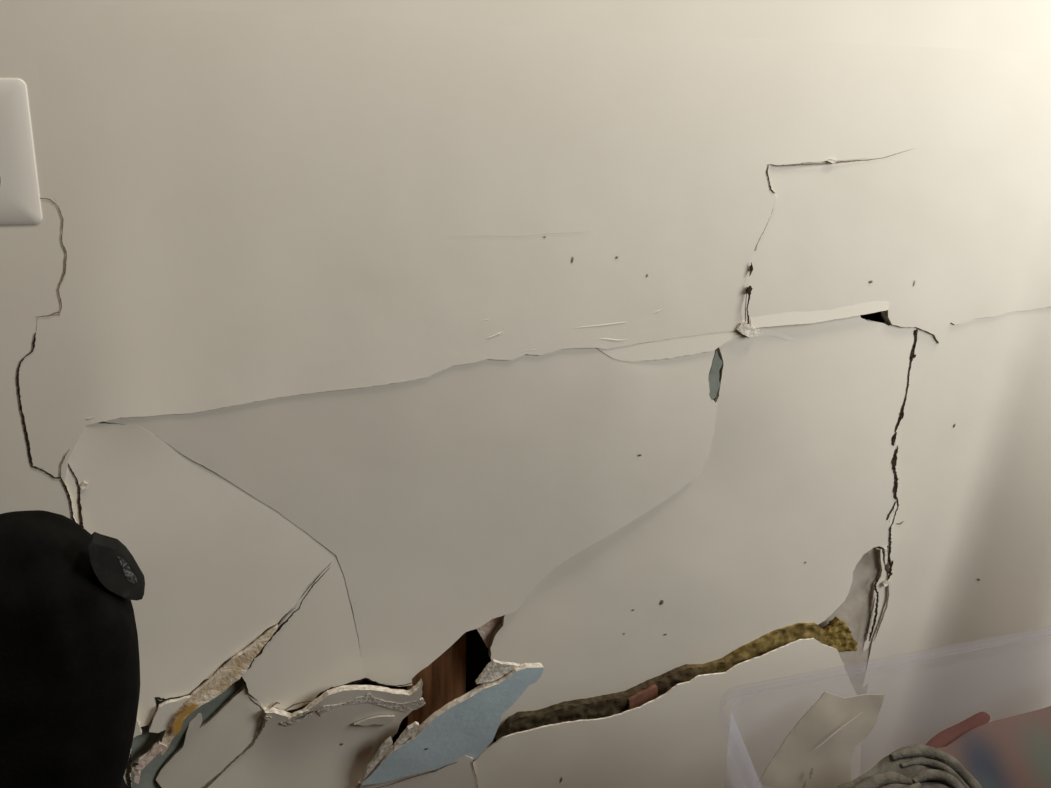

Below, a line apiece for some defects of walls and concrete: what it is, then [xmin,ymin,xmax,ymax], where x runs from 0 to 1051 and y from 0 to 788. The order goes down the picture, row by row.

crack [745,148,915,324]
crack [16,198,88,528]
peeling [597,301,889,400]
crack [865,330,917,641]
crack [151,694,191,721]
flaking render [131,624,278,788]
crack [225,567,330,670]
crack [204,678,425,788]
spalling [277,678,400,713]
peeling [354,715,419,782]
spalling [466,616,521,693]
spalling [818,548,888,695]